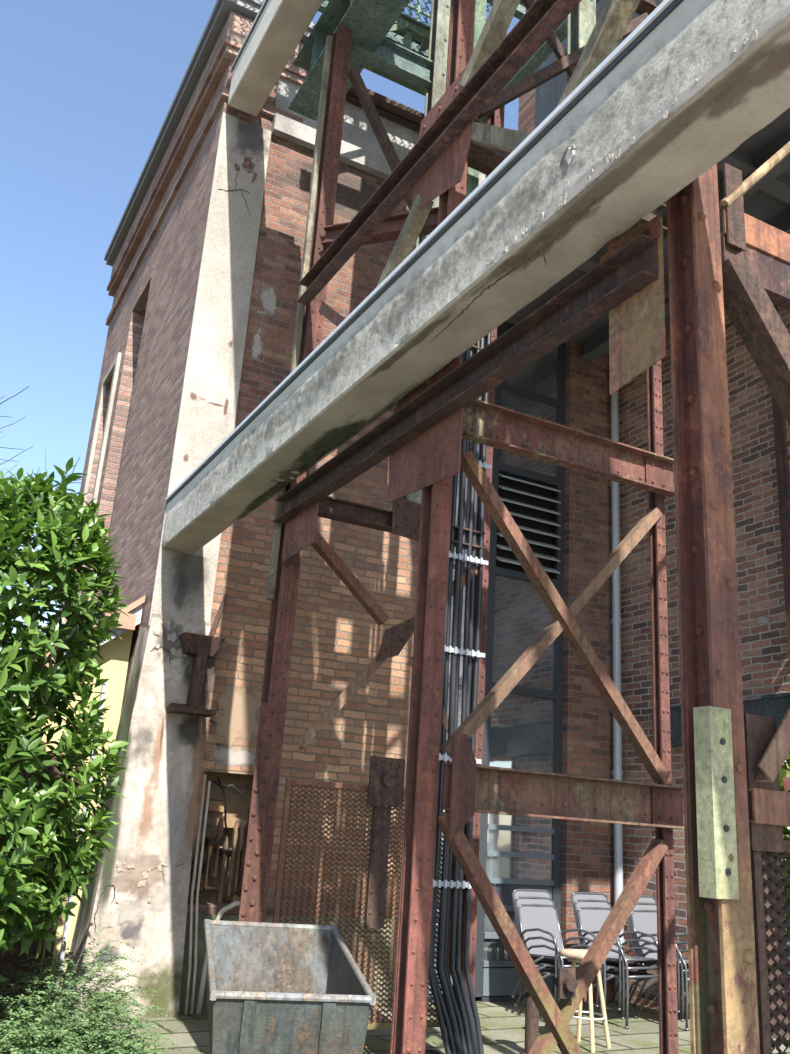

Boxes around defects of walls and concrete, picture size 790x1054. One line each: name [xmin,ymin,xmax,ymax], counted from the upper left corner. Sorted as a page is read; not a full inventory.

water stain [238,119,267,152]
water stain [489,45,790,279]
crack [220,171,250,215]
water stain [373,315,449,375]
water stain [175,556,202,604]
peeling [116,862,162,903]